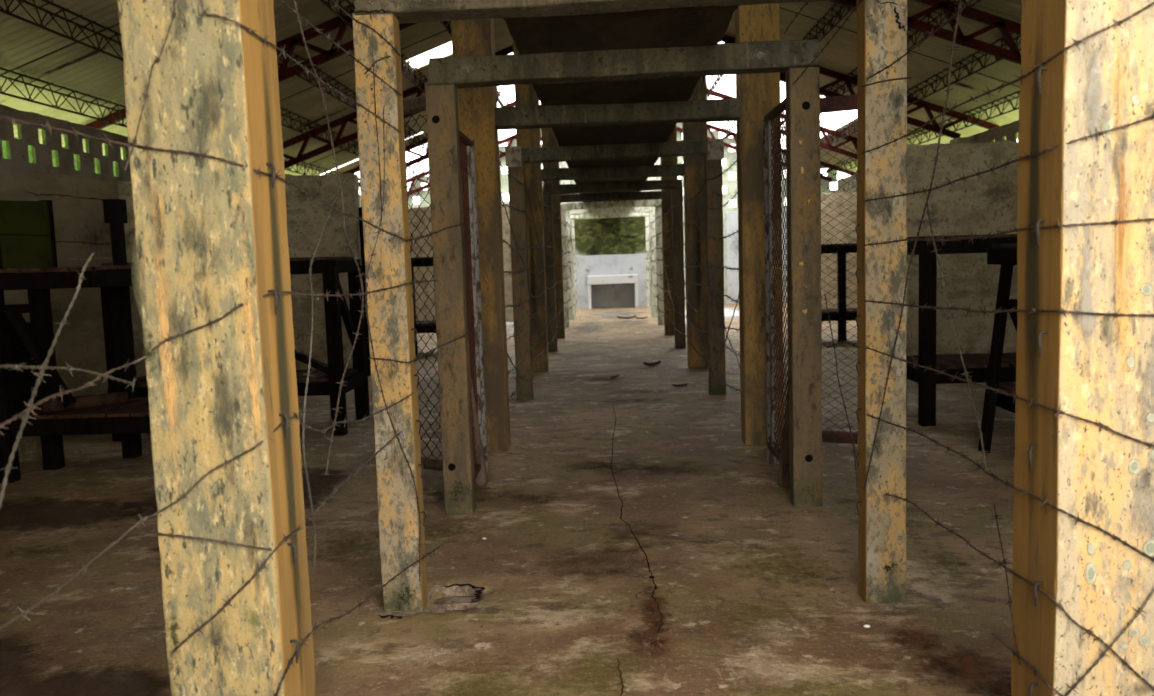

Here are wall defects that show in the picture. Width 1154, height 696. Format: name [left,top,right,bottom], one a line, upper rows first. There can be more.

damp [1103,199,1131,341]
damp [216,374,233,448]
damp [243,280,262,434]
crack [610,405,663,633]
damp [210,626,222,648]